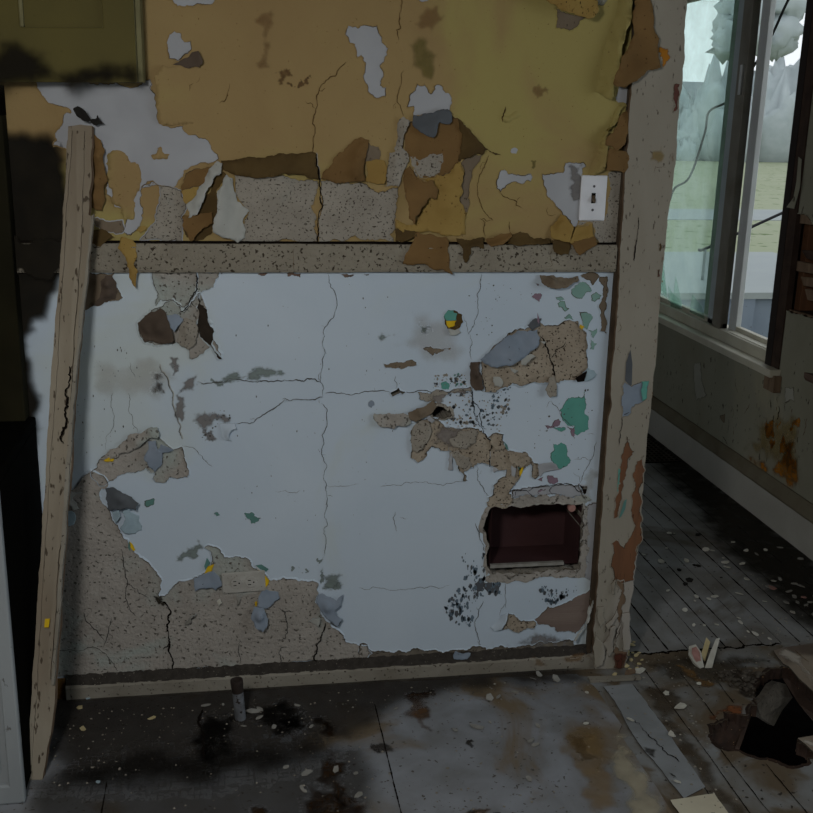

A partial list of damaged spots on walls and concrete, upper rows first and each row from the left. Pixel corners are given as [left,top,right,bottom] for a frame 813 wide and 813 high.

peeling [345,24,389,99]
peeling [35,79,220,236]
peeling [495,161,621,242]
crack [179,273,198,313]
peeling [196,294,222,359]
crack [540,336,565,375]
crack [197,273,492,556]
flaking render [409,373,589,505]
crack [510,402,596,499]
rust [750,418,800,486]
peeling [593,436,646,675]
crack [60,551,196,670]